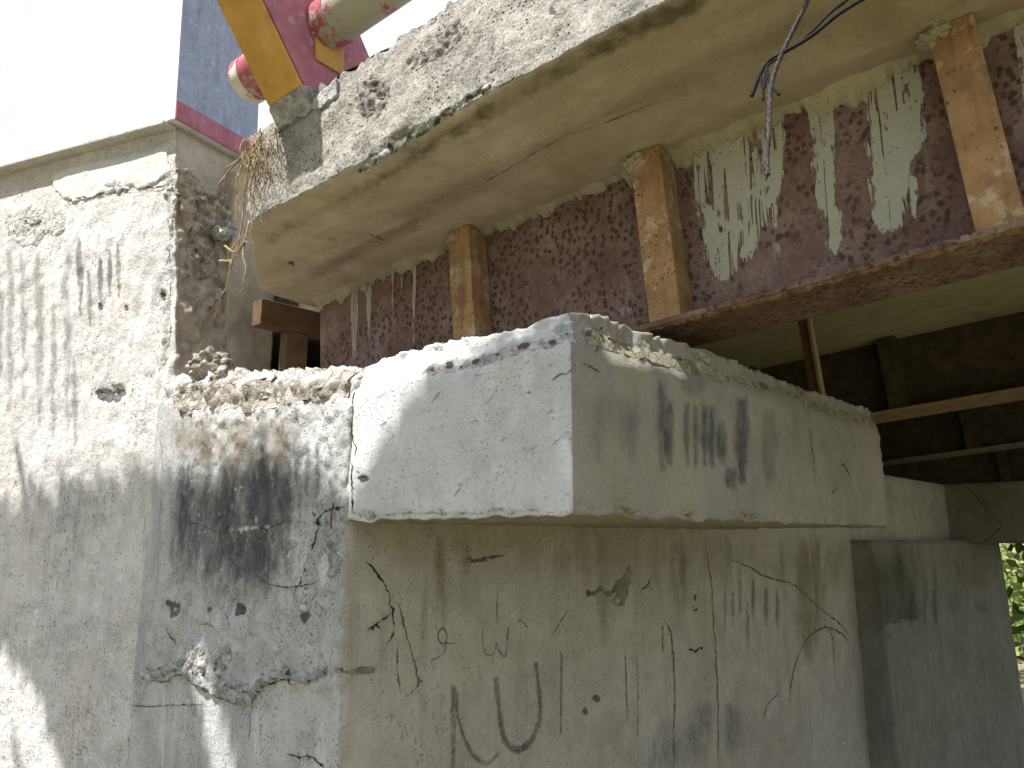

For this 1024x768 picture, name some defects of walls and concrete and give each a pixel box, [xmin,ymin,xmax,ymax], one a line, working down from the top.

spalling [356,83,491,173]
damp [76,239,119,324]
peeling [5,146,233,365]
spalling [95,379,126,402]
spalling [172,369,360,417]
damp [666,399,750,486]
damp [176,423,319,581]
crack [182,383,408,607]
peeling [139,642,377,714]
crack [366,562,423,695]
spalling [585,565,632,606]
crack [662,544,854,768]